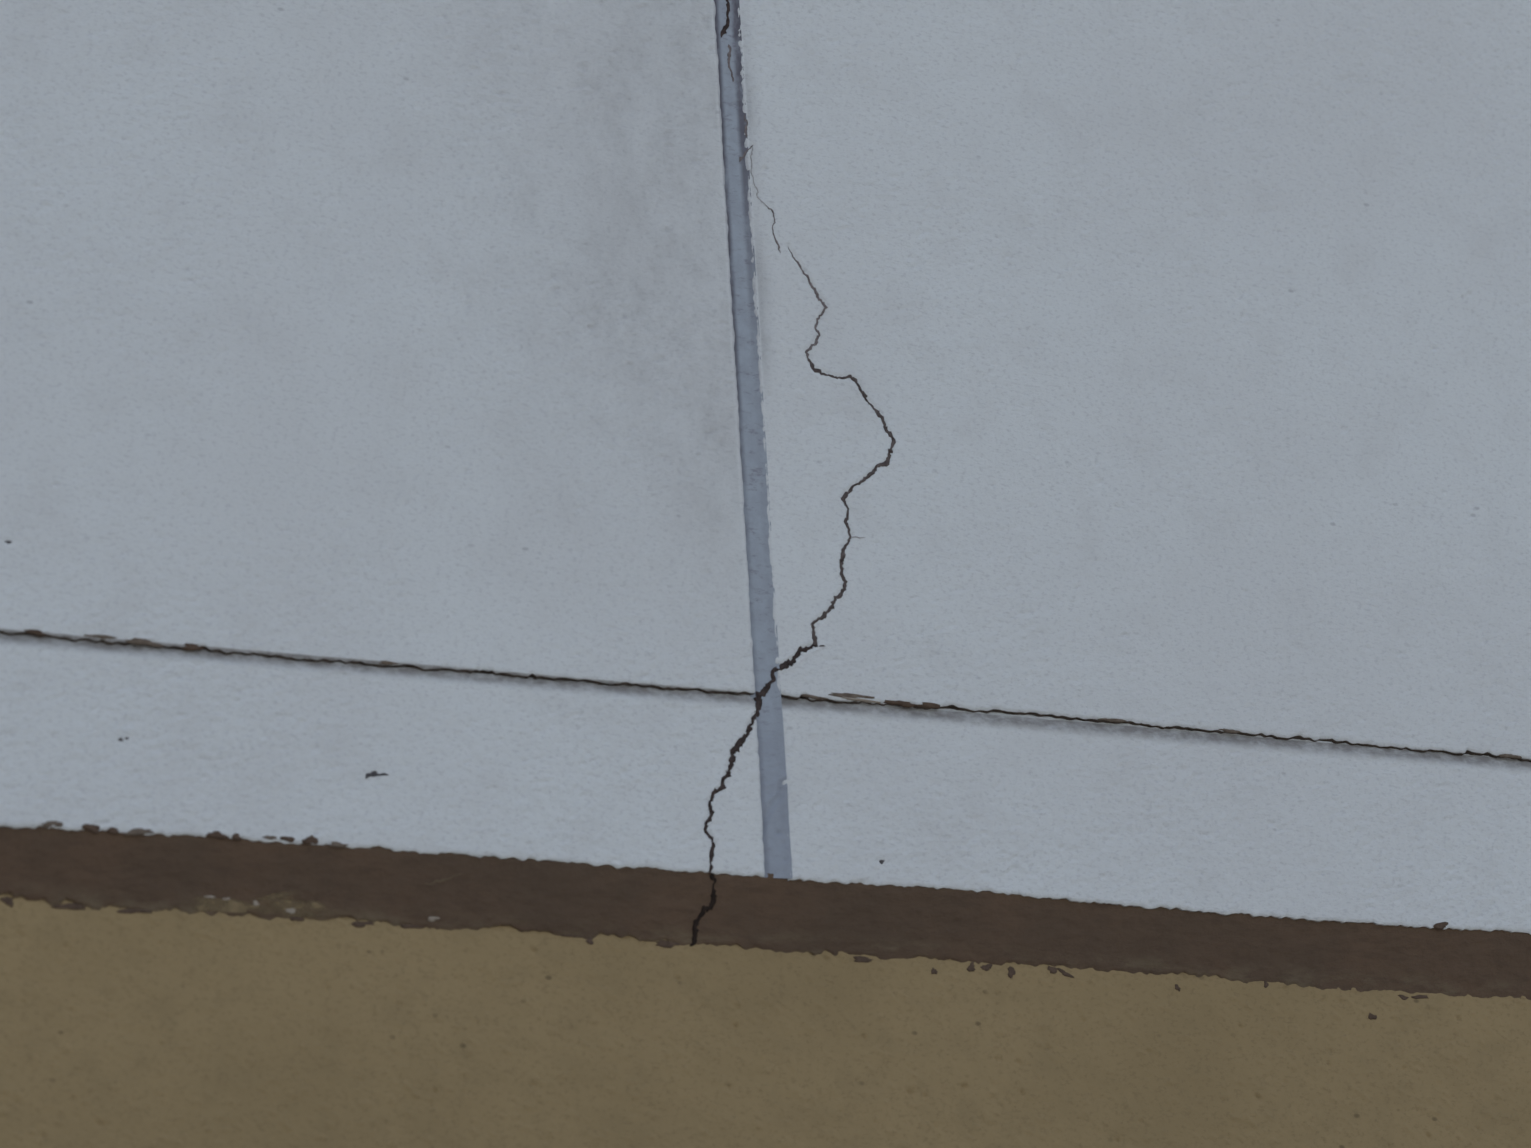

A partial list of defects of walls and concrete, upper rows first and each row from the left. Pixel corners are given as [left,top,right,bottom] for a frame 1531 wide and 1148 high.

crack [689,0,896,946]